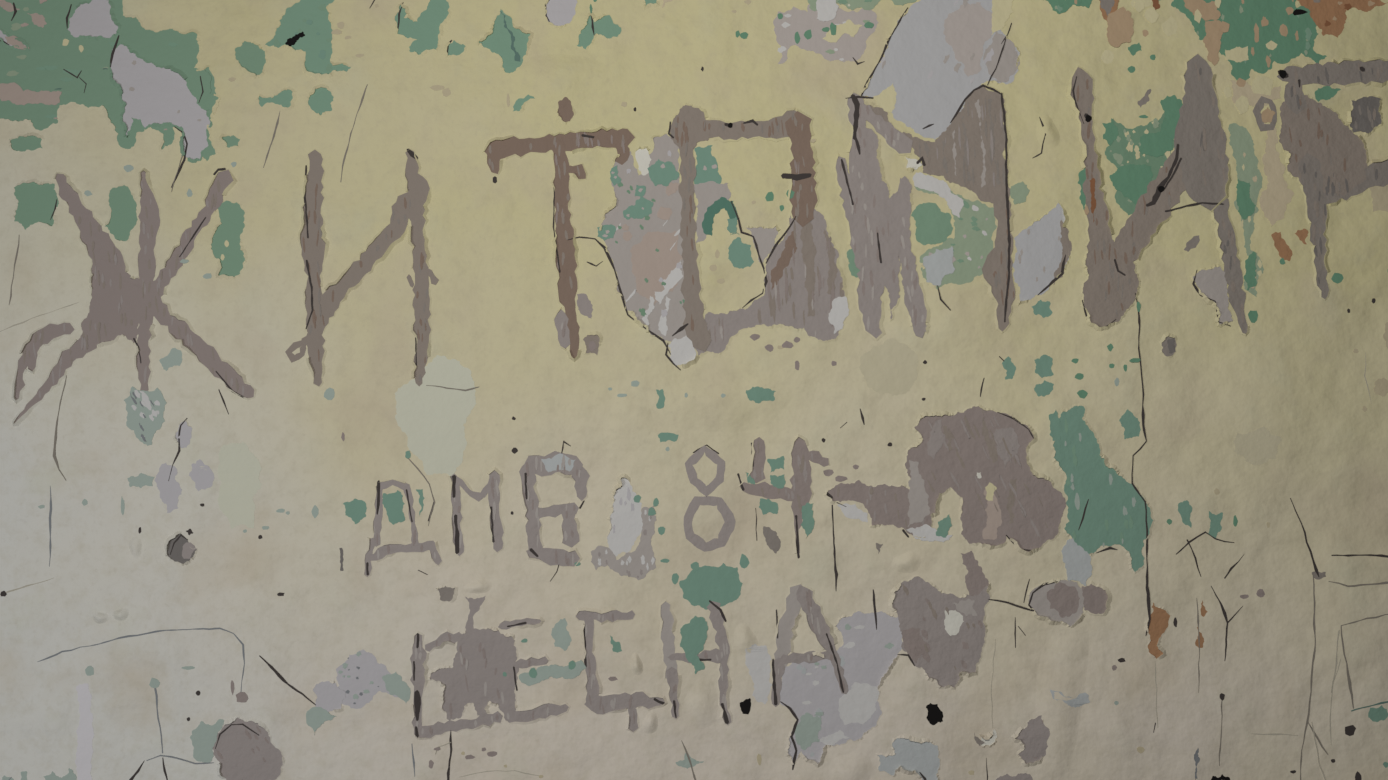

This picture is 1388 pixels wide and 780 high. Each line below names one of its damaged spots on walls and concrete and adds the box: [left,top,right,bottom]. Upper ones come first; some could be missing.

peeling [0,0,241,175]
peeling [485,0,1388,369]
peeling [343,479,428,575]
spalling [452,475,473,554]
peeling [306,585,677,740]
peeling [518,450,656,580]
peeling [656,389,665,409]
peeling [658,432,678,442]
peeling [679,563,743,674]
flaking render [721,355,1155,780]
crack [1038,255,1243,661]
flaking render [190,715,285,780]